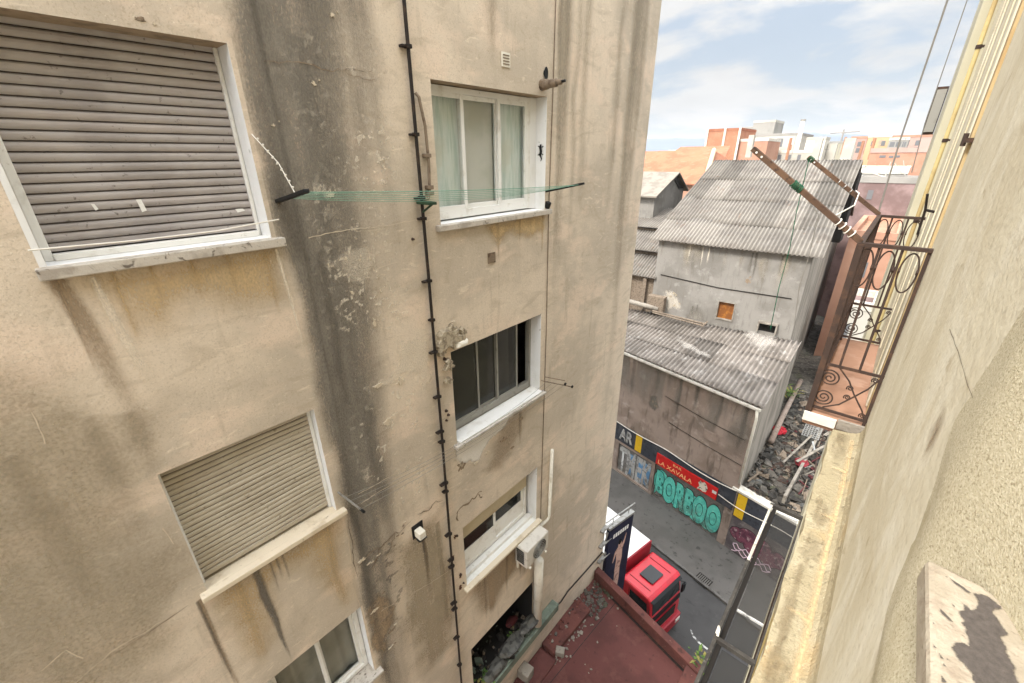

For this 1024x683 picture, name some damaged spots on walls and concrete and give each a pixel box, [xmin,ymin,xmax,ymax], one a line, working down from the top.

leakage [236,0,393,683]
peeling [327,248,395,320]
crack [344,450,482,611]
peeling [933,579,1019,683]